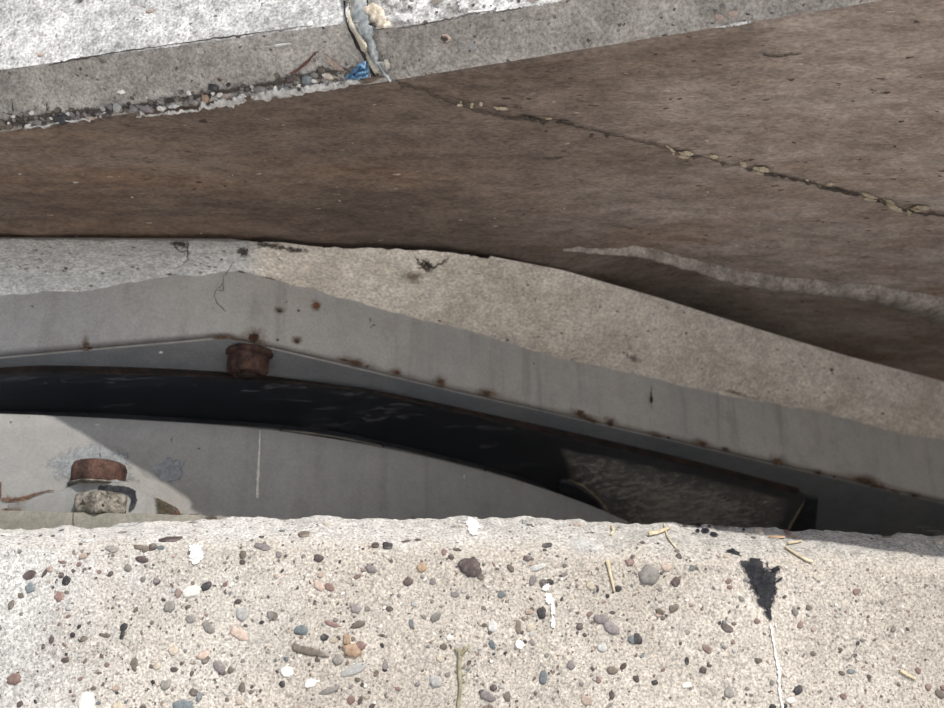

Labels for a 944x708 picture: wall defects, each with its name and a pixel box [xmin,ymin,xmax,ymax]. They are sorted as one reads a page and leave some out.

crack [395,80,944,217]
corrosion [0,482,55,511]
efflorescence [770,623,784,708]